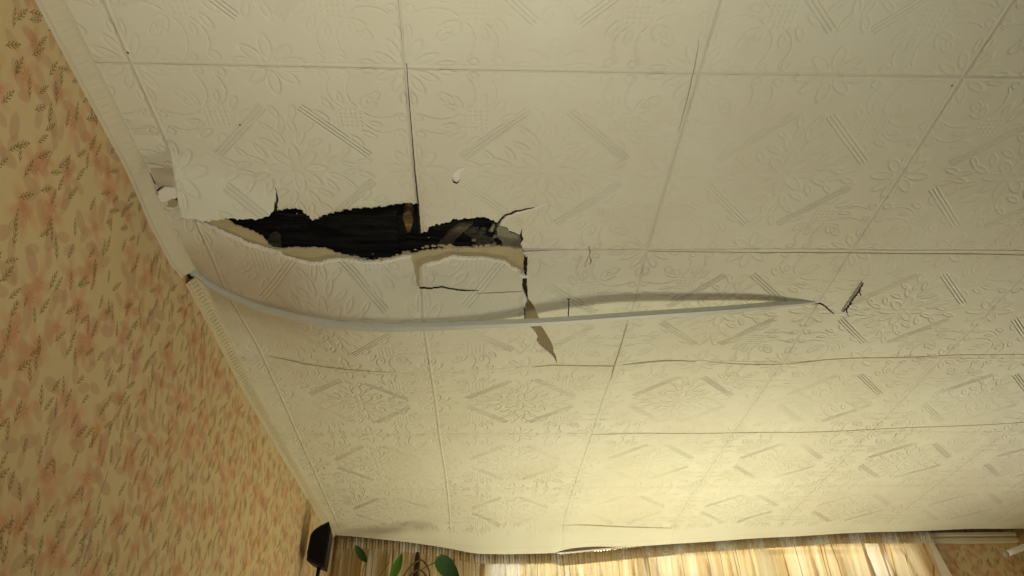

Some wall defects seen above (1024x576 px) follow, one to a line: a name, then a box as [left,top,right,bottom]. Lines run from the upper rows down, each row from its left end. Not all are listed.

crack [420,202,549,319]
crack [811,282,867,316]